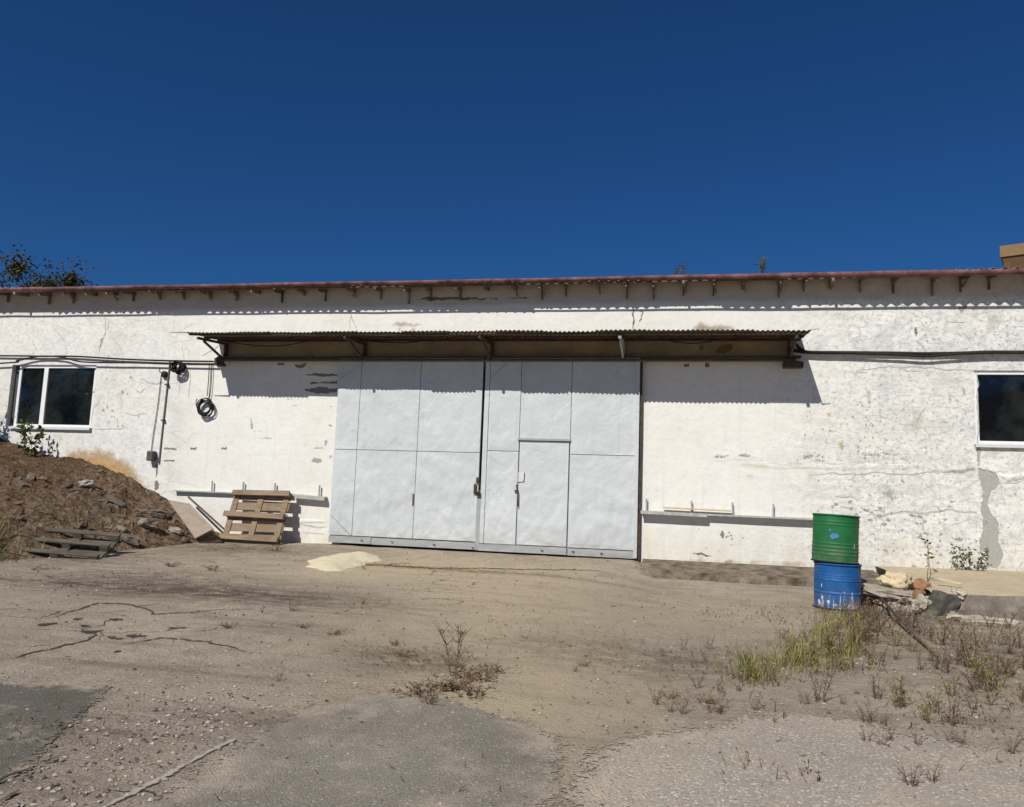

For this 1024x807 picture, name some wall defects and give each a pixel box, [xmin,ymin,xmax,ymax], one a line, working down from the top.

peeling [277,363,337,394]
peeling [831,500,963,567]
flaking render [946,447,1009,571]